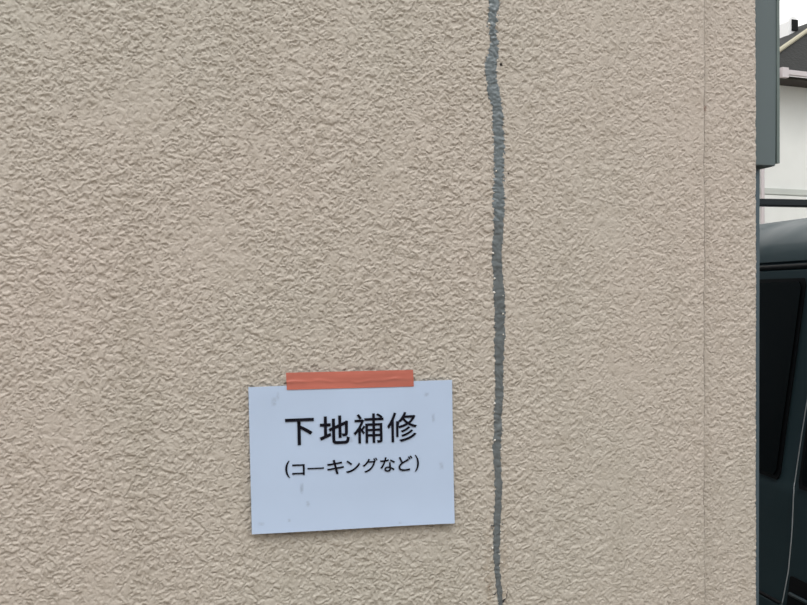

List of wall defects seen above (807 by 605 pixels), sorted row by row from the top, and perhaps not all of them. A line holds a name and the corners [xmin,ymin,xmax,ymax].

crack [484,0,508,605]